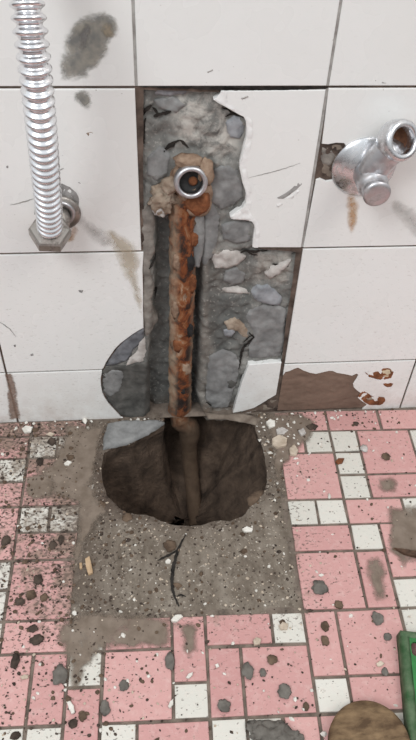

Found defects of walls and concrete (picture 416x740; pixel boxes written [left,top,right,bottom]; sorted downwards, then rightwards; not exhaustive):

damp [61,14,116,76]
damp [76,92,90,106]
corrosion [173,153,215,216]
corrosion [6,374,20,419]
spalling [70,90,304,623]
spalling [358,391,385,405]
spalling [365,368,393,387]